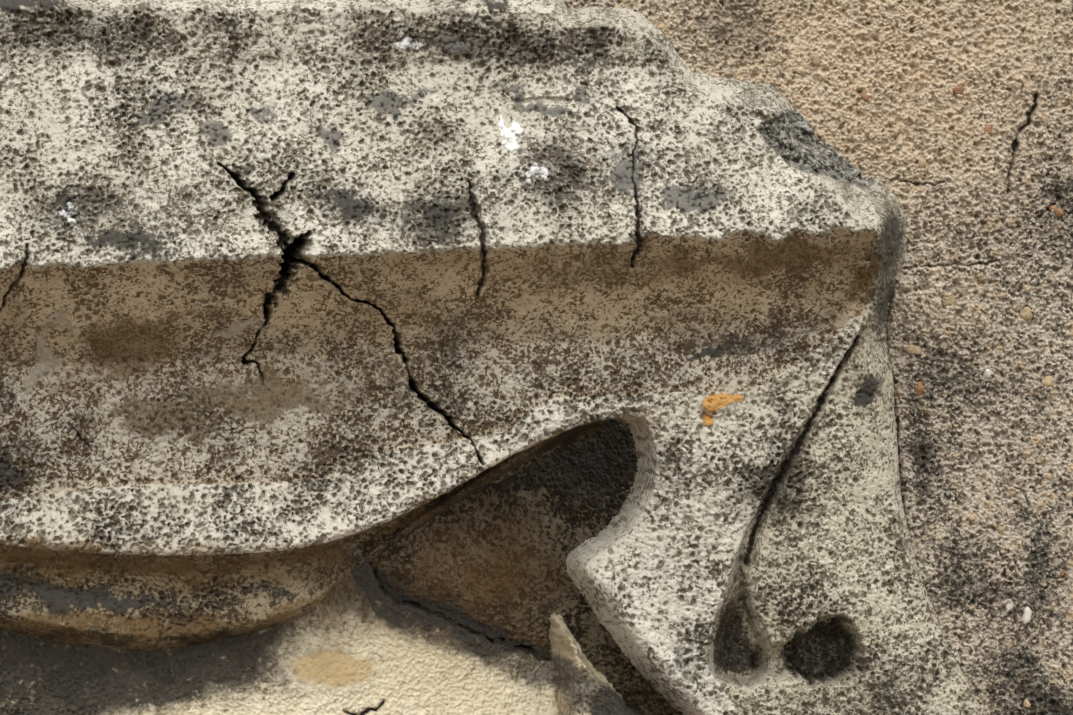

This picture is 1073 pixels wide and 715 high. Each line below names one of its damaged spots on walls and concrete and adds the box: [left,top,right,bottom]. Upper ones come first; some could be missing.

crack [217,163,482,463]
crack [468,182,488,294]
crack [617,108,642,267]
crack [1007,95,1037,192]
crack [743,338,856,564]